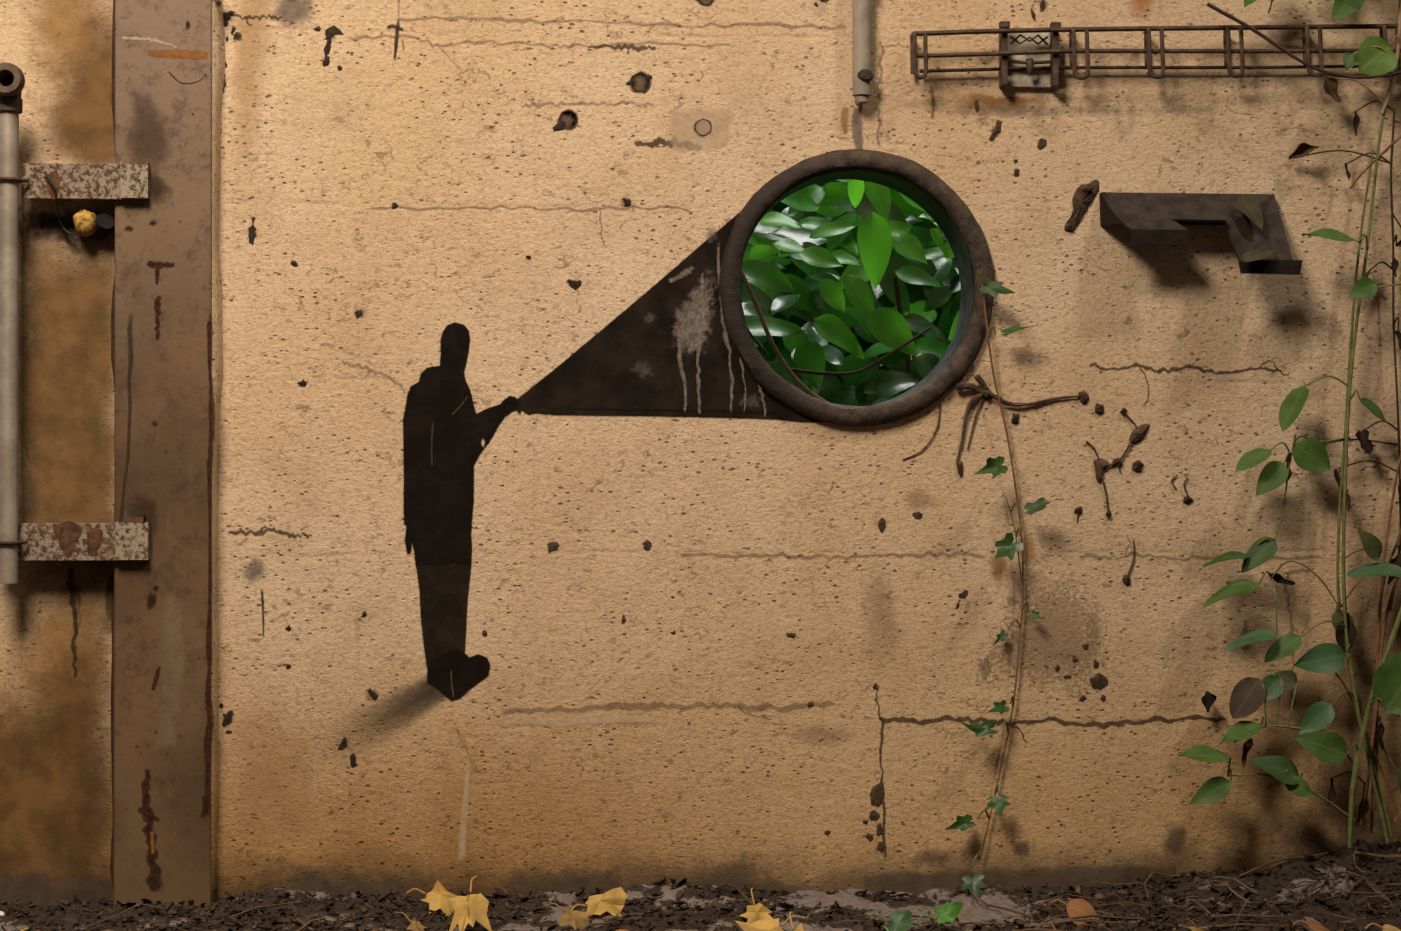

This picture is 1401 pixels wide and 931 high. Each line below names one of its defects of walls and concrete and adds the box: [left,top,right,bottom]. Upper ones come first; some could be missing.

leakage [41,0,115,164]
leakage [18,211,114,523]
rust [119,320,154,531]
crack [1090,360,1289,406]
rust [53,521,103,559]
rust [147,586,158,608]
rust [201,319,215,817]
leakage [0,561,114,906]
rust [138,769,161,891]
crack [875,686,1226,857]